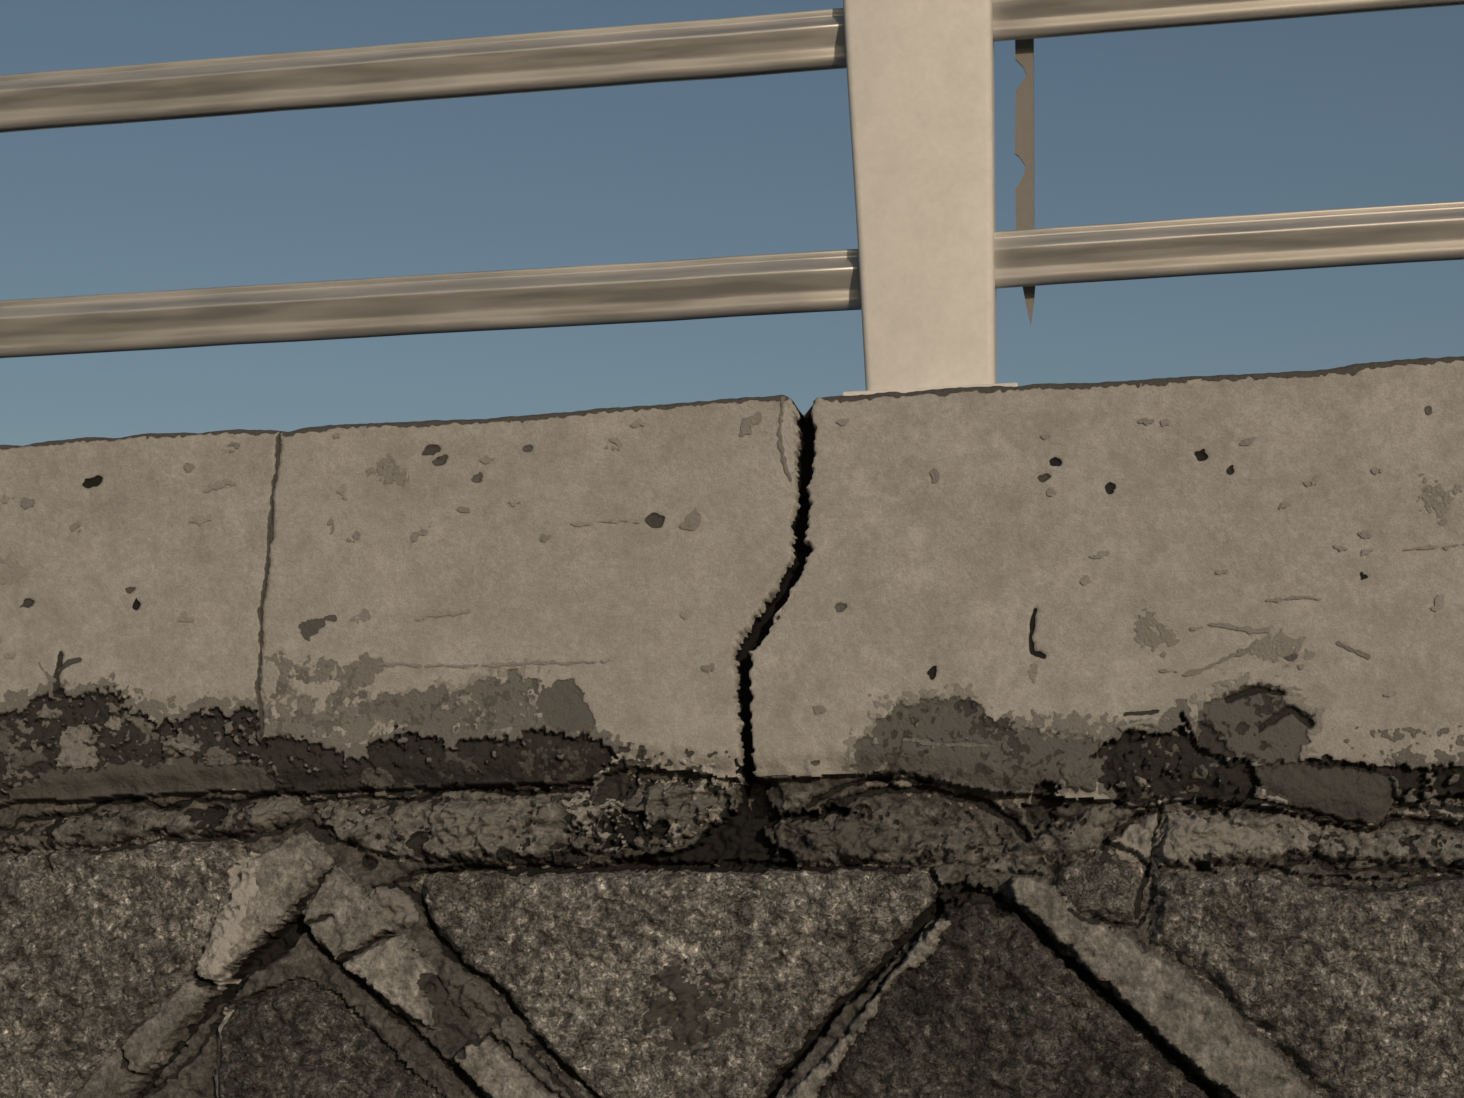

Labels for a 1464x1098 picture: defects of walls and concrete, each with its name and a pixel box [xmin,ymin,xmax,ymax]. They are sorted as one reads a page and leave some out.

crack [376,658,610,669]
crack [735,396,1032,843]
spalling [852,682,1464,873]
spalling [221,913,310,1004]
spalling [416,973,488,1060]
crack [116,860,911,1098]
crack [765,900,944,1098]
spalling [931,880,1013,918]